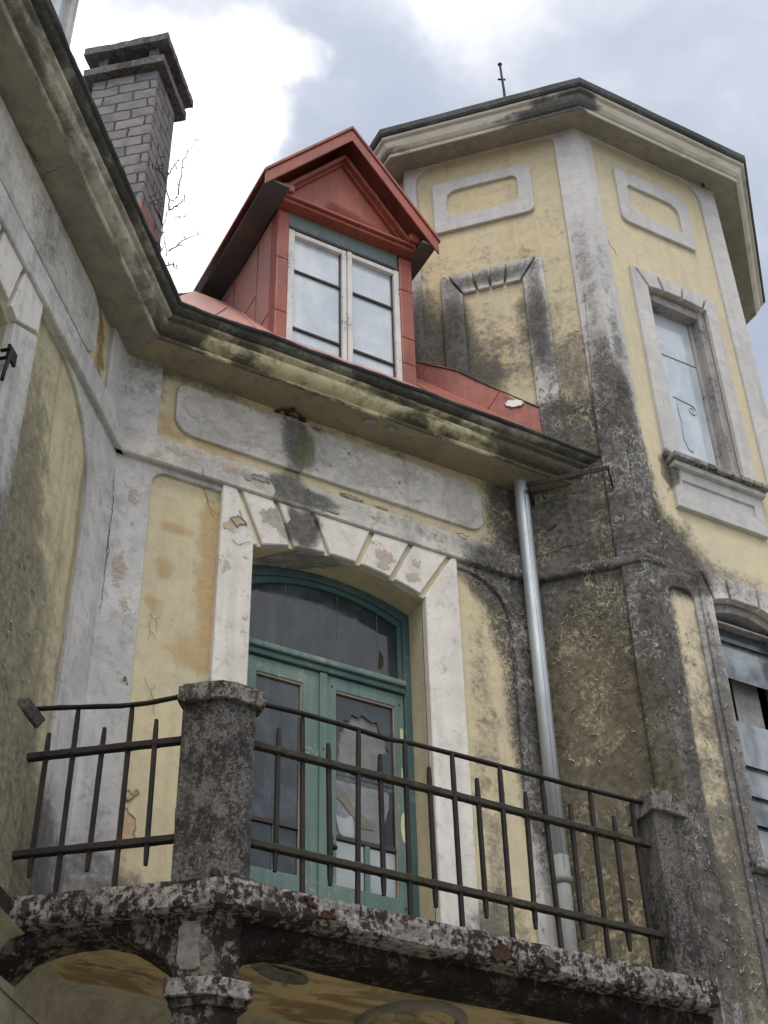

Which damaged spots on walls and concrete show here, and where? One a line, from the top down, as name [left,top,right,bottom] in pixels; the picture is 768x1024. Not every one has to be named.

leakage [413,262,549,388]
crack [100,469,115,608]
peeling [224,510,247,534]
leakage [183,395,336,547]
peeling [369,539,396,570]
leakage [460,483,551,884]
leakage [529,337,751,1024]
peeling [116,789,140,839]